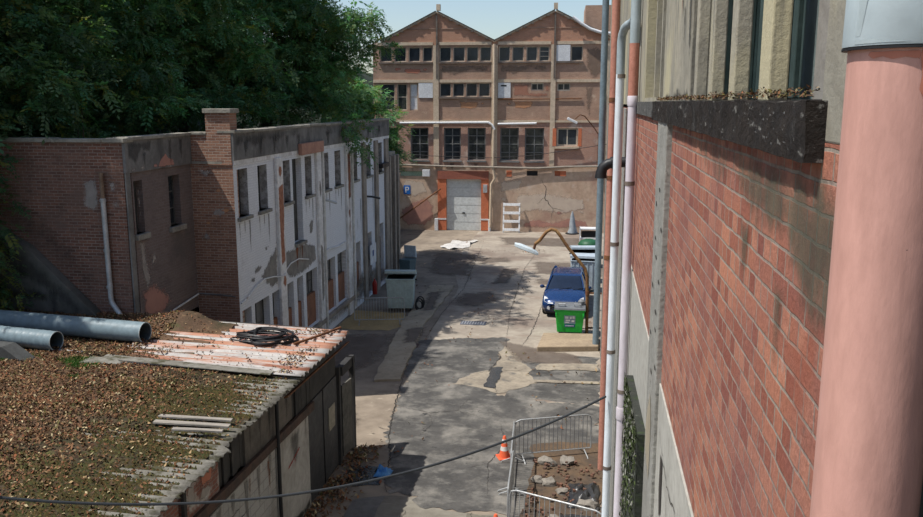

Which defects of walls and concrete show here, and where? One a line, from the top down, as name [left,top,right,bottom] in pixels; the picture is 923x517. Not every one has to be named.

peeling [854,0,923,96]
peeling [252,167,325,300]
peeling [402,180,433,225]
rust [293,326,342,345]
crack [378,372,477,492]